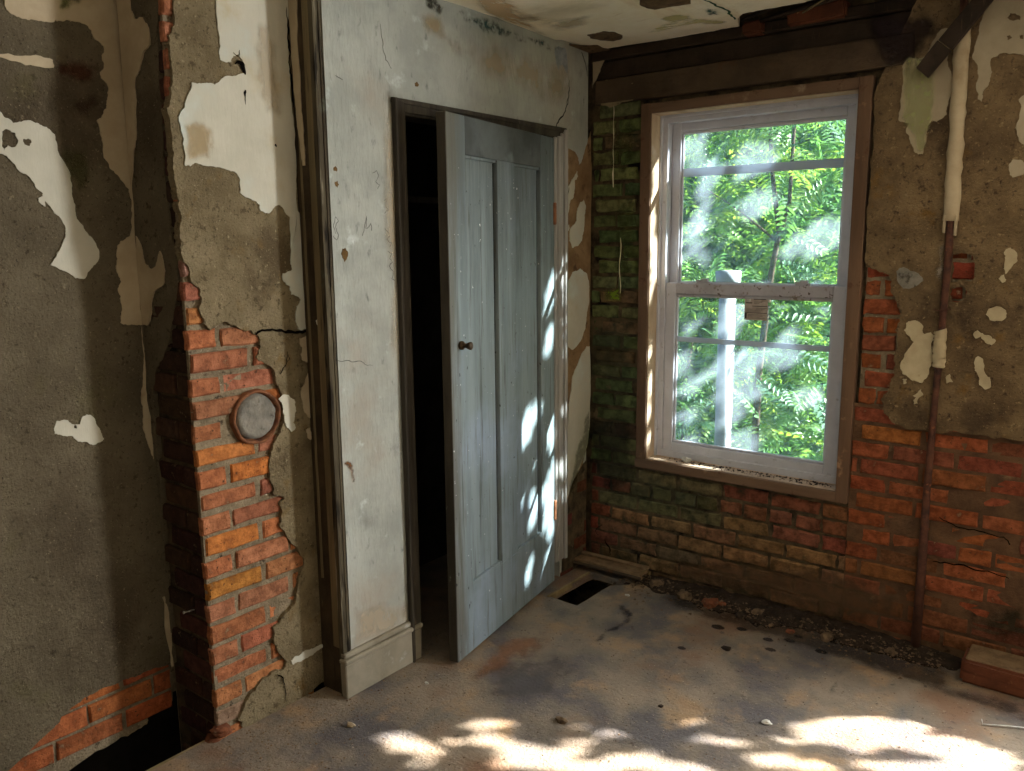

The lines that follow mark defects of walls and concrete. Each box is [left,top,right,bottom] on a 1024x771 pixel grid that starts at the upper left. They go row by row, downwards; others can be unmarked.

water stain [427,0,442,31]
water stain [657,9,722,30]
peeling [972,0,1024,102]
peeling [898,28,952,154]
crack [256,328,306,374]
flaking render [0,0,323,771]
flaking render [560,95,1024,658]
crack [939,517,1011,545]
crack [933,561,1009,579]